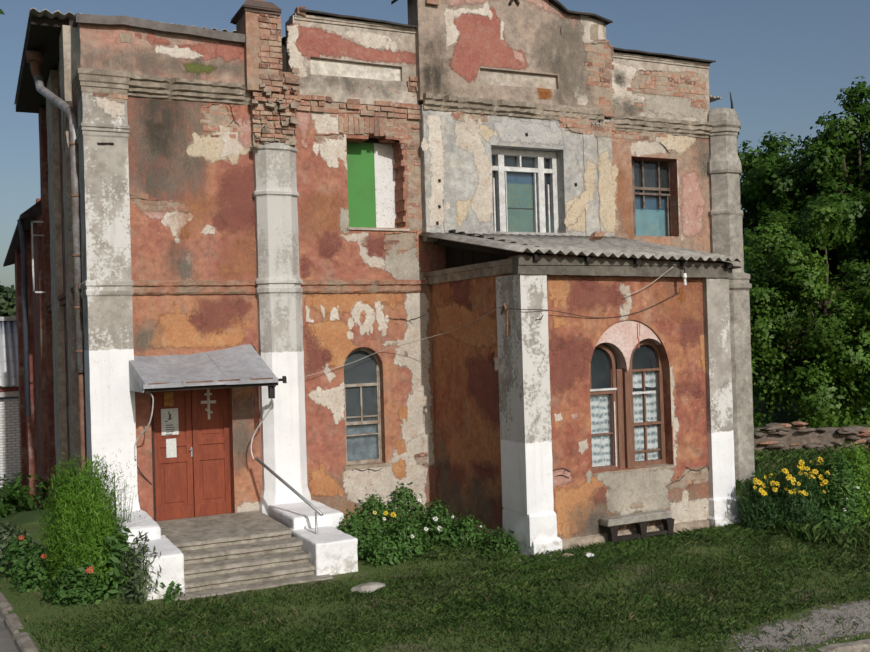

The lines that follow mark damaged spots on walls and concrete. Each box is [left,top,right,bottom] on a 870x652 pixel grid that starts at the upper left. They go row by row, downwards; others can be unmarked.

damp [131,98,207,197]
peeling [186,103,252,165]
spalling [281,0,707,280]
spalling [130,193,193,243]
peeling [547,278,572,352]
peeling [616,283,632,321]
peeling [304,292,498,512]
peeling [553,366,709,539]